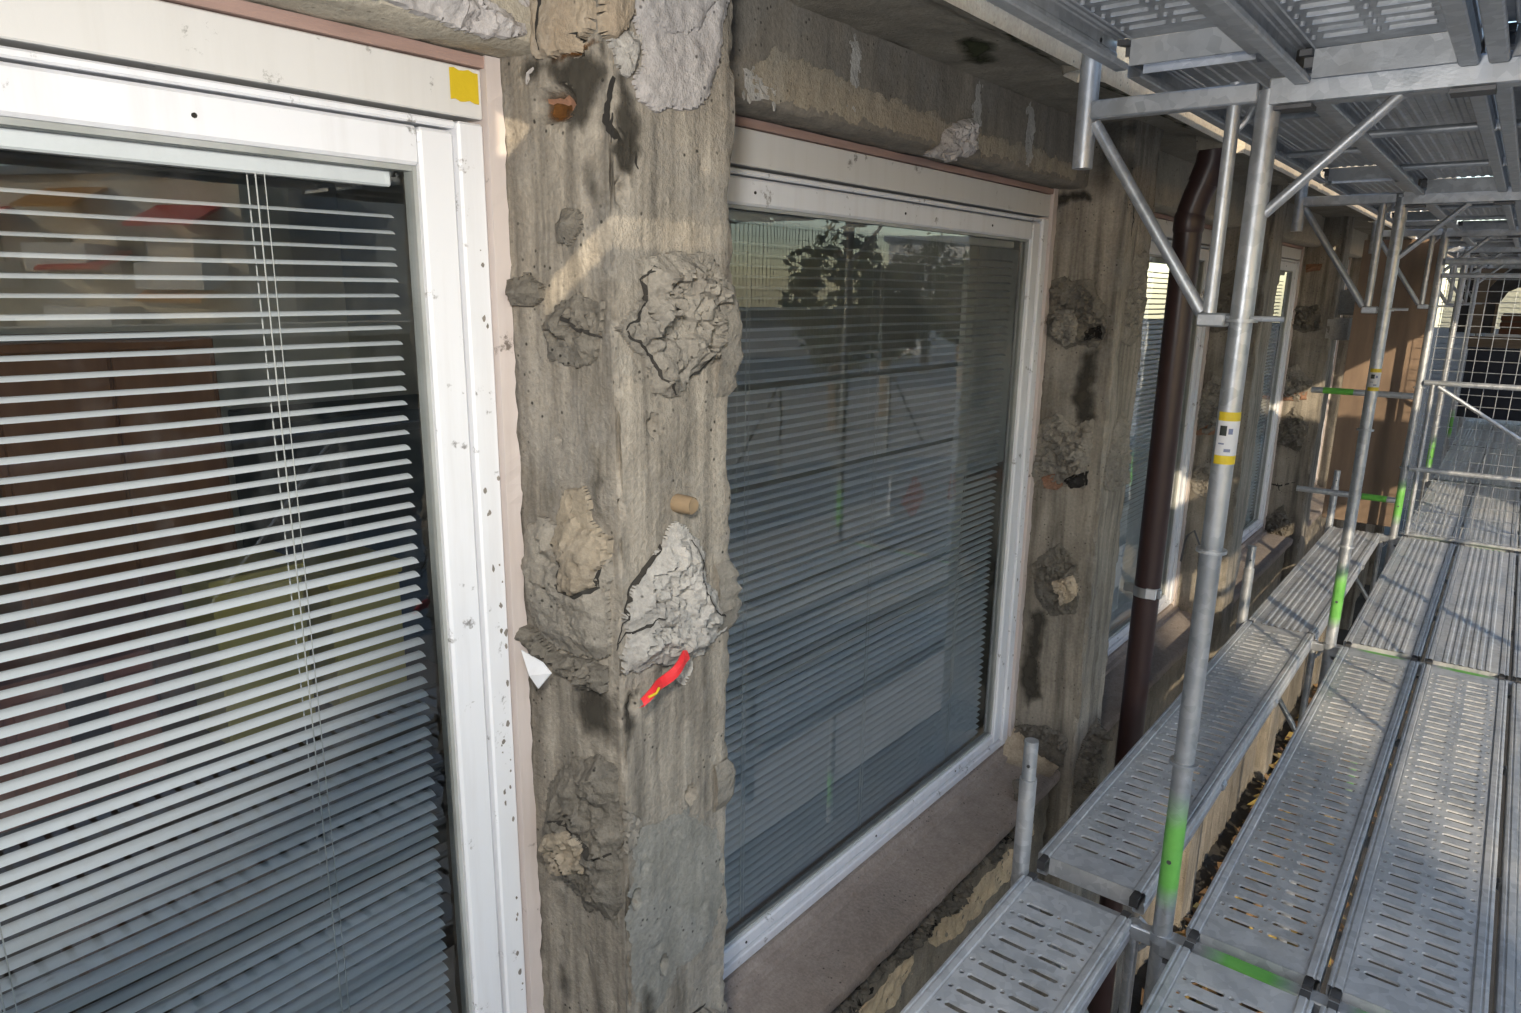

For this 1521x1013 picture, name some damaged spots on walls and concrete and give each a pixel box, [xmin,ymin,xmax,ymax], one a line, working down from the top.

spalling [371,0,636,60]
rust [552,40,594,63]
rust [548,95,577,122]
peeling [752,46,1086,181]